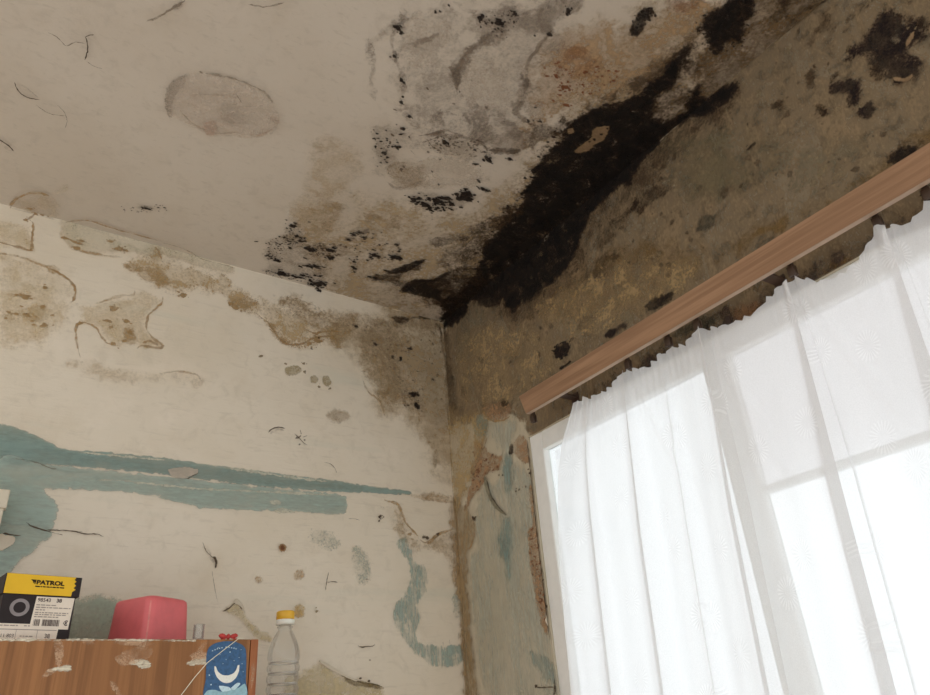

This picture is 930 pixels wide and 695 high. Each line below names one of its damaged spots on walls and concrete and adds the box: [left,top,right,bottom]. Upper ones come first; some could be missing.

damp [0,192,76,301]
damp [61,236,105,256]
damp [126,247,224,298]
damp [4,293,54,328]
damp [74,299,164,352]
damp [222,0,930,695]
spalling [465,436,550,637]